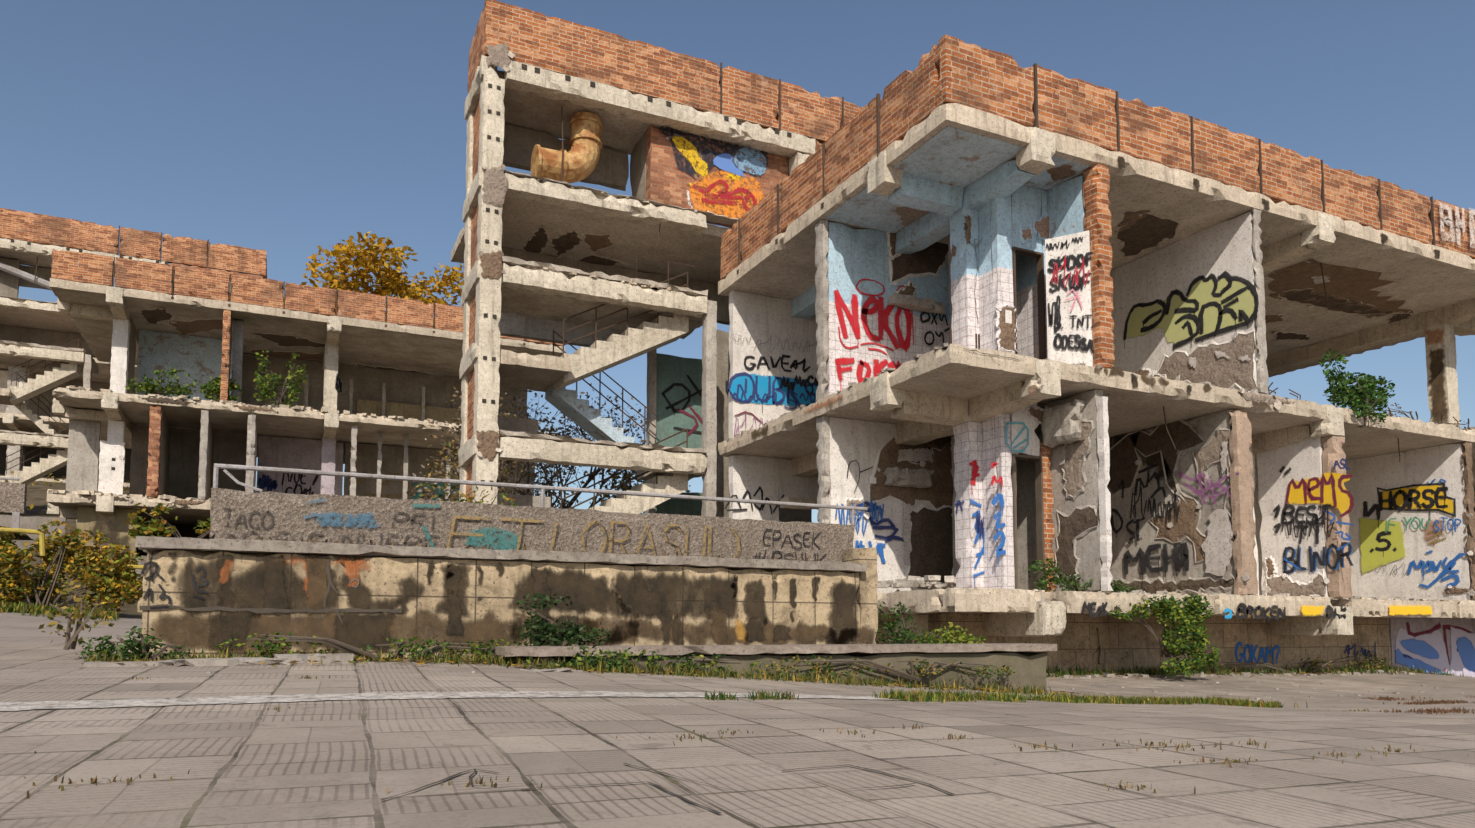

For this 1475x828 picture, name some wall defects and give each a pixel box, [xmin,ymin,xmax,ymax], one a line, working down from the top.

peeling [1047,165,1076,182]
spalling [887,206,980,296]
spalling [1114,211,1182,258]
spalling [1132,257,1416,410]
peeling [843,432,954,588]
peeling [1054,418,1330,597]
leakage [145,552,874,657]